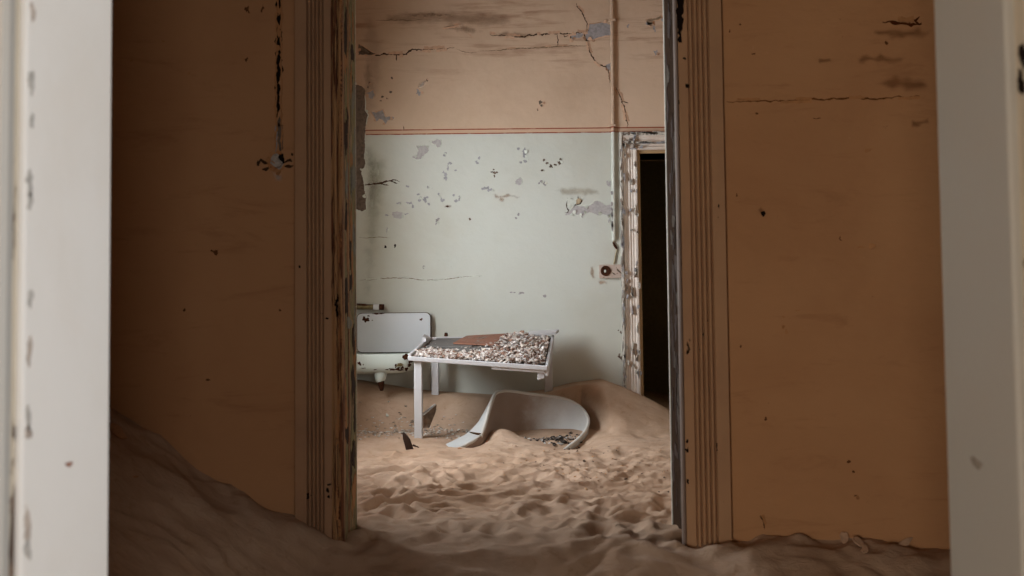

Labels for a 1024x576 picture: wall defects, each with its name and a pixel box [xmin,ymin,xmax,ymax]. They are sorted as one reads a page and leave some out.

flaking render [569,20,610,42]
peeling [646,1,671,38]
crack [883,15,922,27]
crack [273,0,284,152]
crack [361,3,630,127]
crack [726,95,920,104]
crack [361,178,399,186]
peeling [320,9,394,518]
peeling [565,50,690,518]